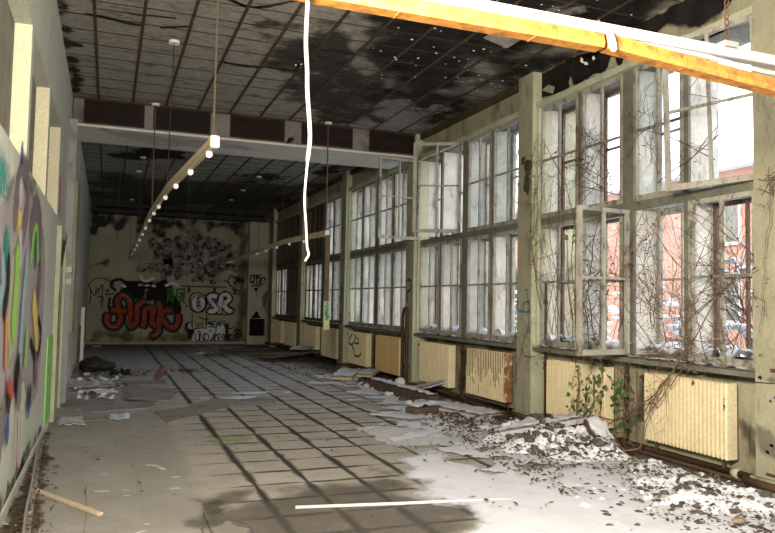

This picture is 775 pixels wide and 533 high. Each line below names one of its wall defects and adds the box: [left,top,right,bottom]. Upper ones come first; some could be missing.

leakage [223,61,298,71]
peeling [542,51,623,97]
leakage [375,99,447,127]
peeling [130,233,238,285]
leakage [190,479,468,533]